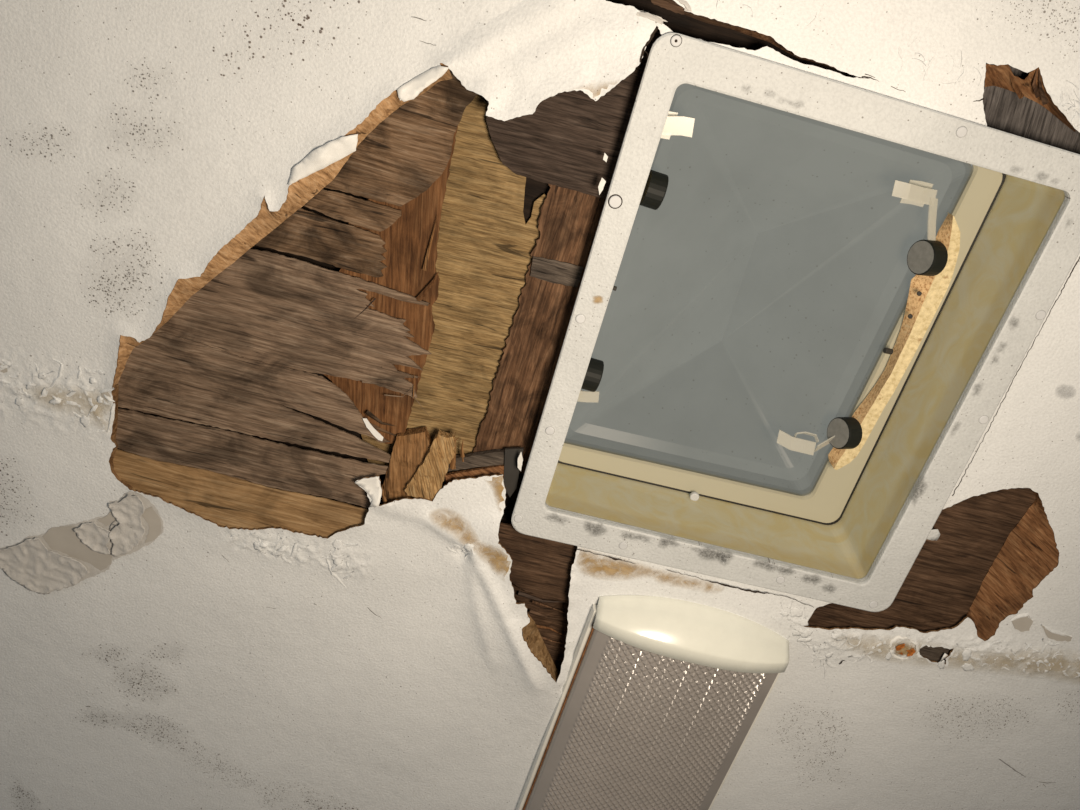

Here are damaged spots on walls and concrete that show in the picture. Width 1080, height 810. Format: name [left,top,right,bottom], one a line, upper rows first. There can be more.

crack [640,27,658,63]
peeling [1060,80,1080,127]
crack [952,257,1080,496]
peeling [0,491,164,595]
rust [889,636,919,660]